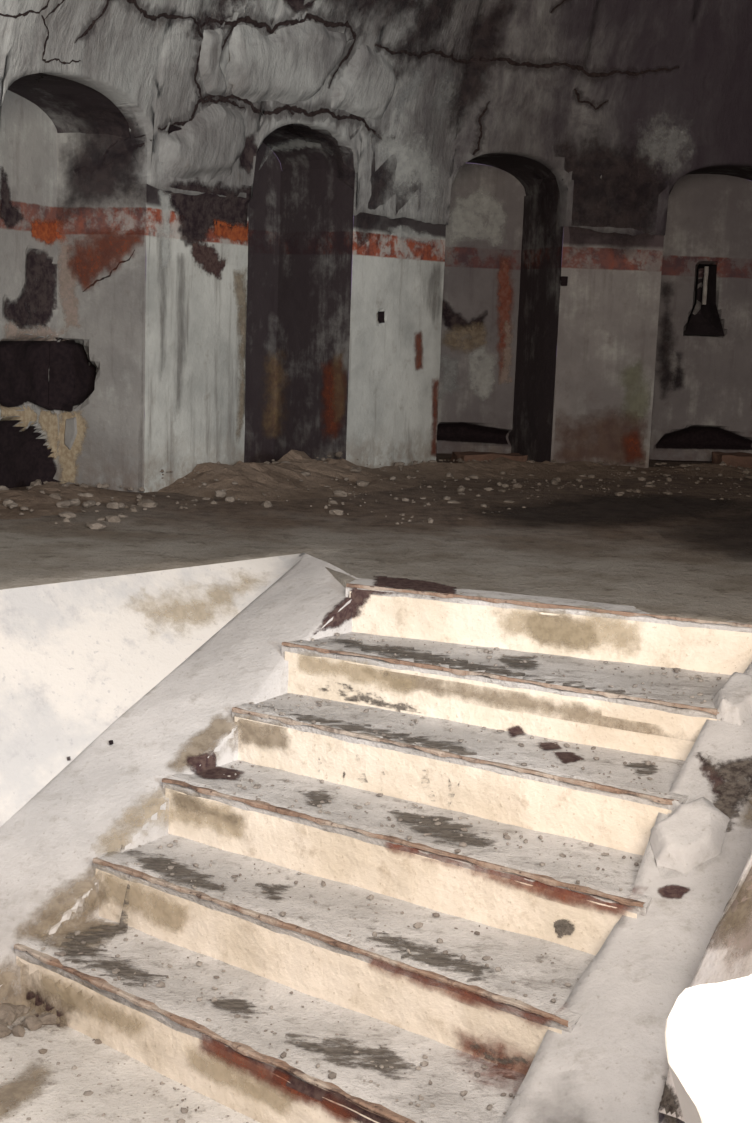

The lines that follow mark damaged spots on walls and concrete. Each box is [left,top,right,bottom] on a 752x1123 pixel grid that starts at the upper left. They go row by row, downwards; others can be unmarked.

crack [0,0,679,155]
corrosion [31,219,145,288]
spalling [0,243,96,484]
spalling [712,672,752,725]
spalling [649,752,752,875]
spalling [710,866,752,957]
corrosion [202,1039,397,1123]